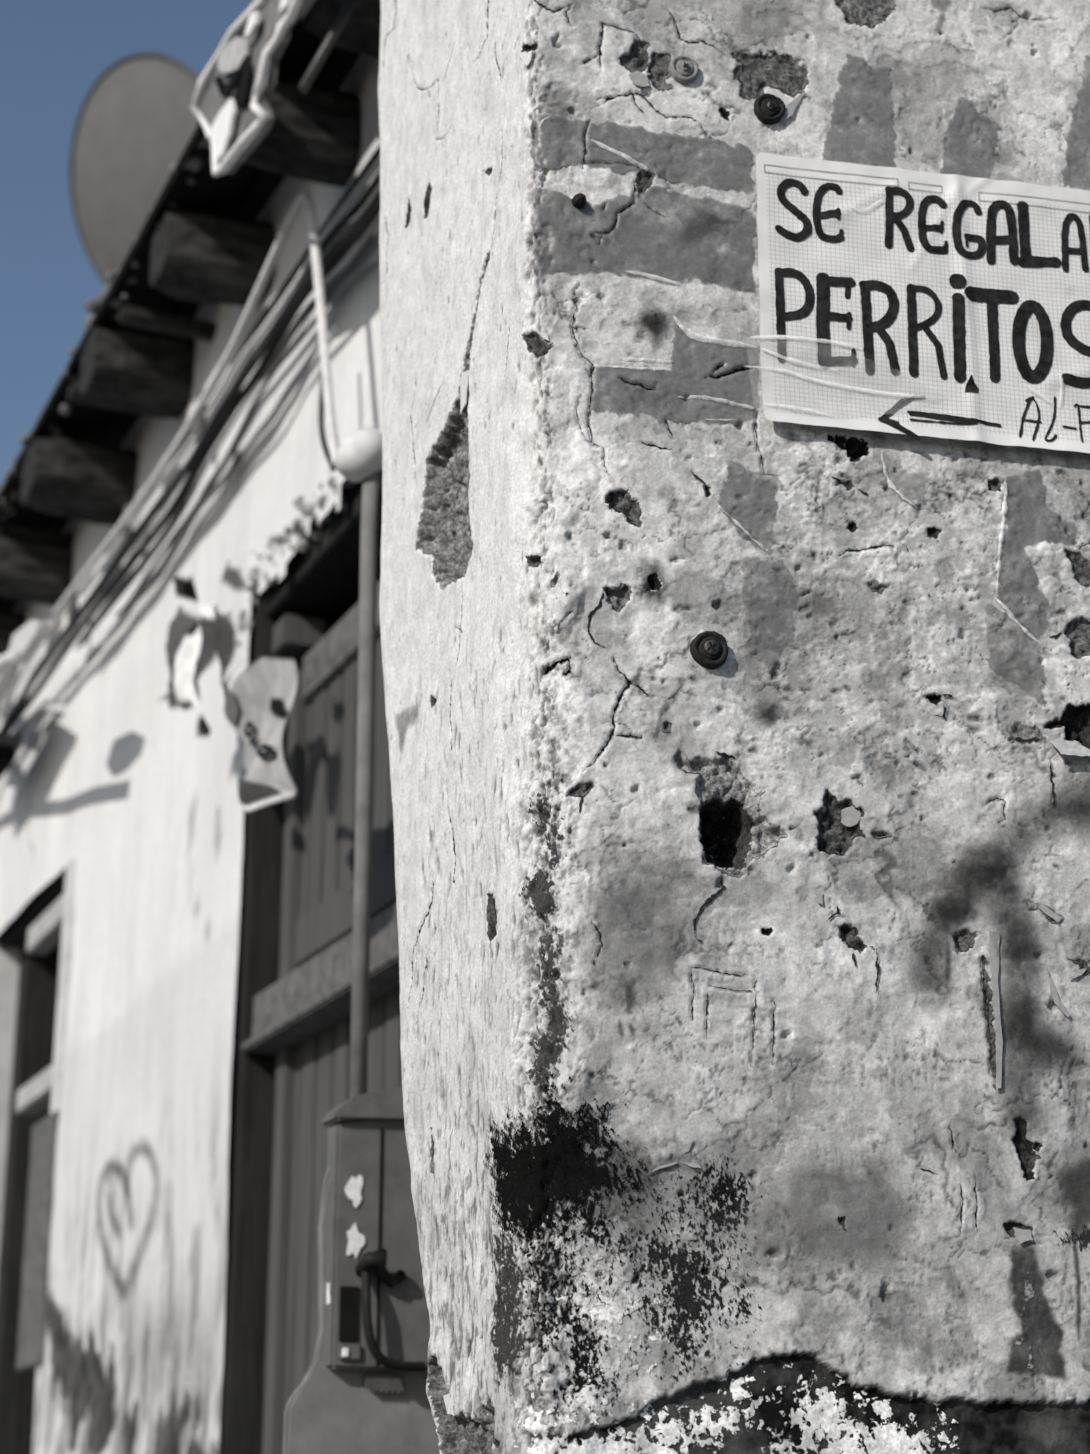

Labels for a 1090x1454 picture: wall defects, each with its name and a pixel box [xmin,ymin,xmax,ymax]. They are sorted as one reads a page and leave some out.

crack [379,0,501,140]
crack [534,0,712,245]
crack [667,9,723,53]
flaking render [732,48,809,122]
flaking render [835,0,896,28]
flaking render [416,252,490,590]
crack [582,658,648,772]
flaking render [1009,702,1090,804]
flaking render [945,930,1003,1089]
peeling [426,750,959,1454]